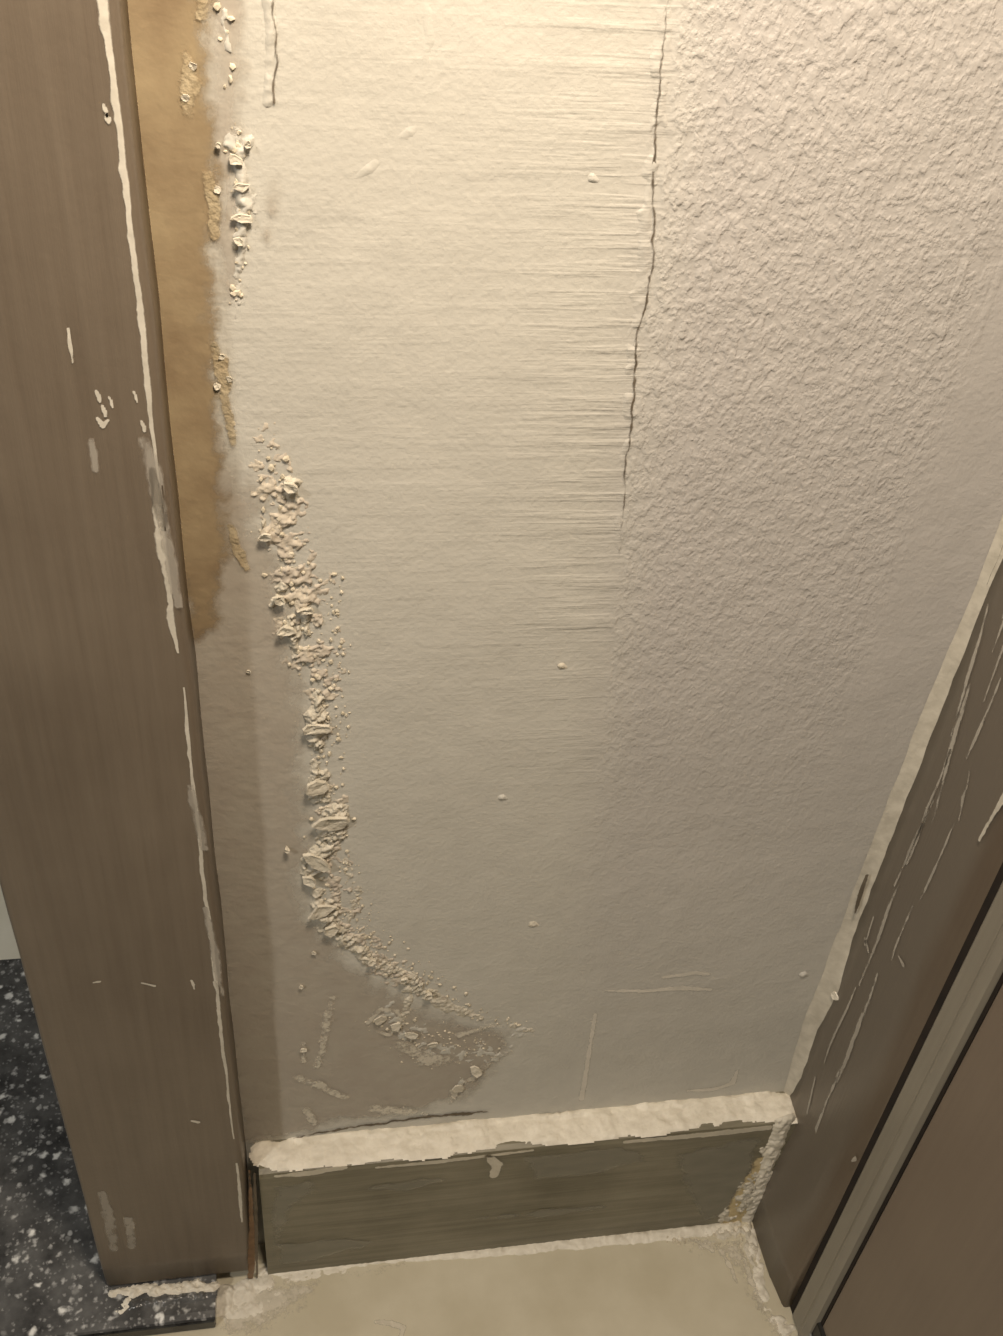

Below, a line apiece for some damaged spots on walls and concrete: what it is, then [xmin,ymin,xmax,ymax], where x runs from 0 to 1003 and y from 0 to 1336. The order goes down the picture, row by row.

peeling [95,0,535,1140]